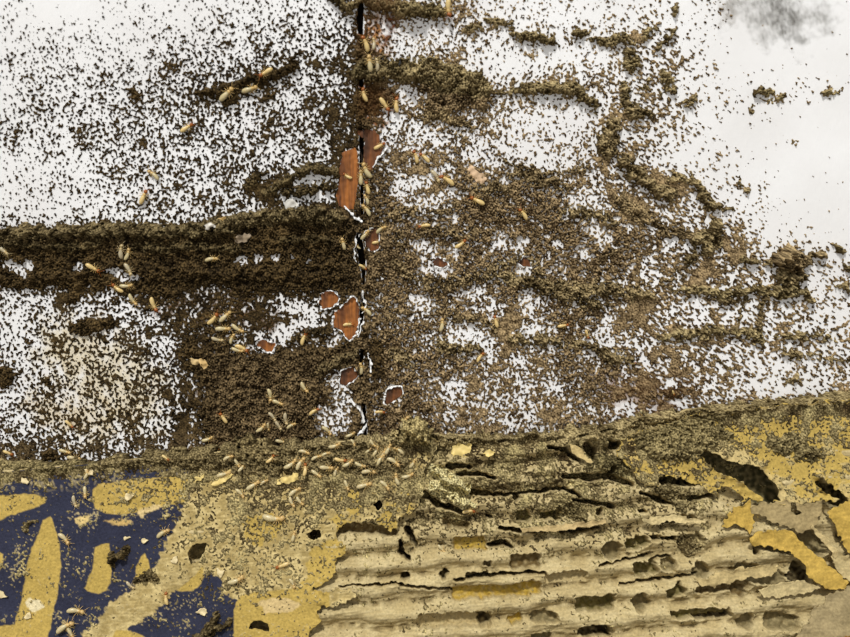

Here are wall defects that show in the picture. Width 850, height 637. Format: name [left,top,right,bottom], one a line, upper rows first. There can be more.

crack [356,3,364,35]
peeling [336,129,383,210]
crack [342,129,388,376]
peeling [317,290,361,342]
peeling [338,367,359,387]
peeling [383,385,404,405]
crack [349,398,372,436]